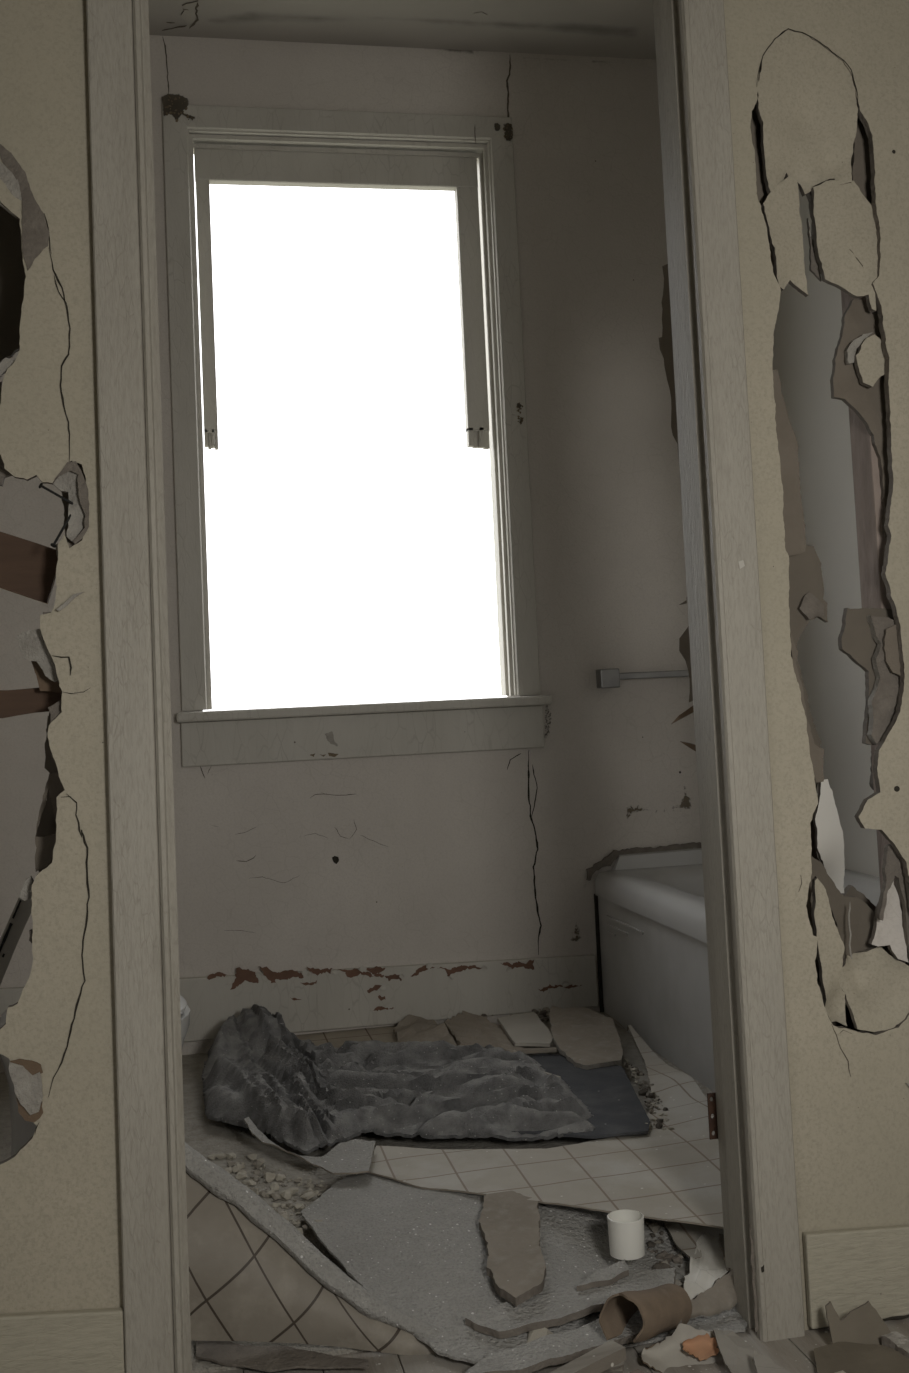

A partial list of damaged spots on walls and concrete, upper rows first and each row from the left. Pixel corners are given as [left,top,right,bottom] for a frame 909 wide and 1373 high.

spalling [0,144,50,270]
spalling [750,30,889,538]
spalling [0,358,15,403]
spalling [0,455,12,487]
spalling [53,461,89,557]
spalling [773,369,909,1032]
spalling [0,592,84,958]
crack [507,751,542,955]
peeling [207,960,534,1011]
spalling [9,1059,43,1123]